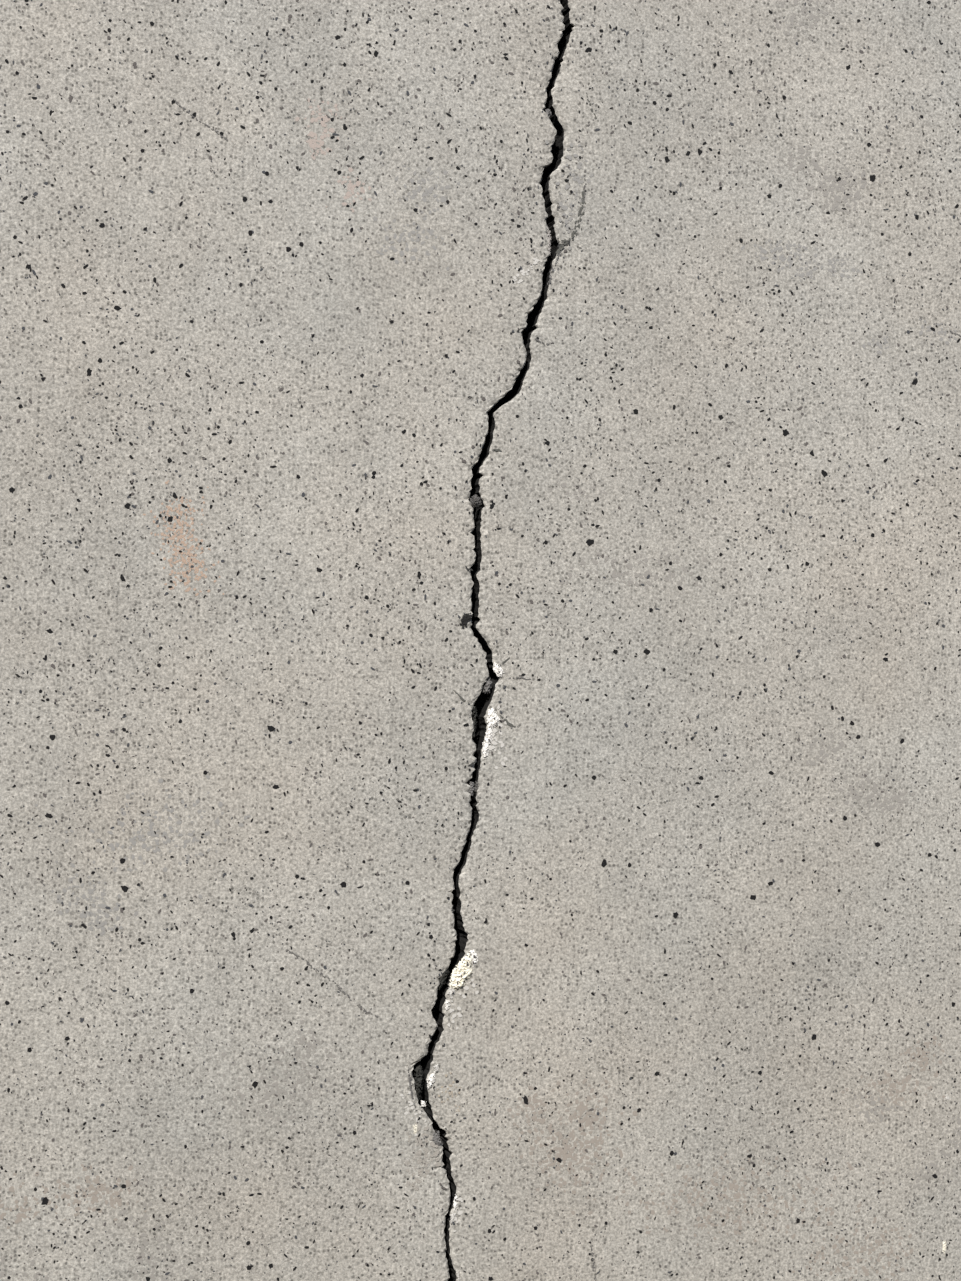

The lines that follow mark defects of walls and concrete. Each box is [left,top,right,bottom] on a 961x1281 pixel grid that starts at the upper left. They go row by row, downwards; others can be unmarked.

crack [407,0,586,1281]